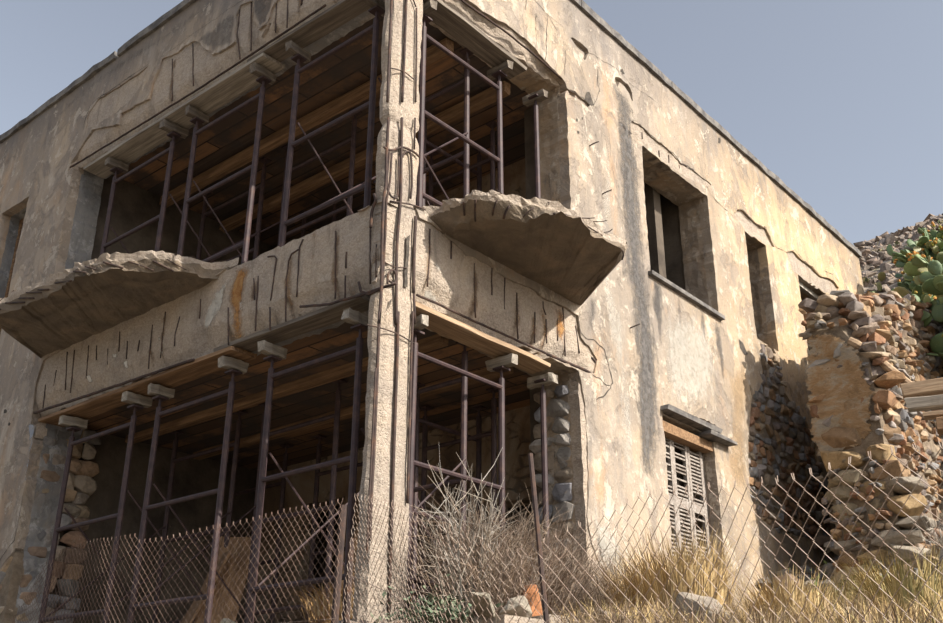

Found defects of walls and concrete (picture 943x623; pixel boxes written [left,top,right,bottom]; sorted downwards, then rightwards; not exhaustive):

spalling [70,0,341,174]
spalling [386,0,417,103]
spalling [441,0,594,134]
spalling [0,261,154,310]
corrosion [231,270,247,338]
spalling [26,117,609,620]
damp [614,87,662,472]
spalling [739,340,831,542]
spalling [0,548,24,623]